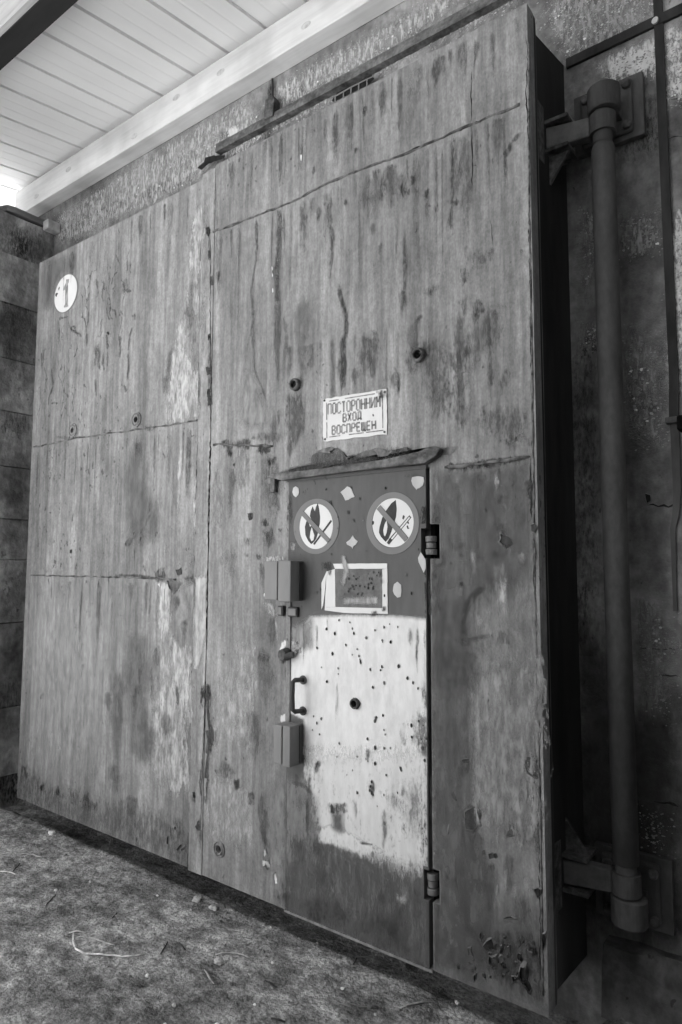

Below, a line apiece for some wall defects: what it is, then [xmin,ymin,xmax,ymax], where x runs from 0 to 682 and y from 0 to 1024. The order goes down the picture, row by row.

corrosion [338,289,376,385]
corrosion [408,303,497,424]
corrosion [451,410,526,470]
water stain [106,636,151,758]
corrosion [192,684,216,801]
peeling [453,573,548,868]
peeling [457,931,546,996]